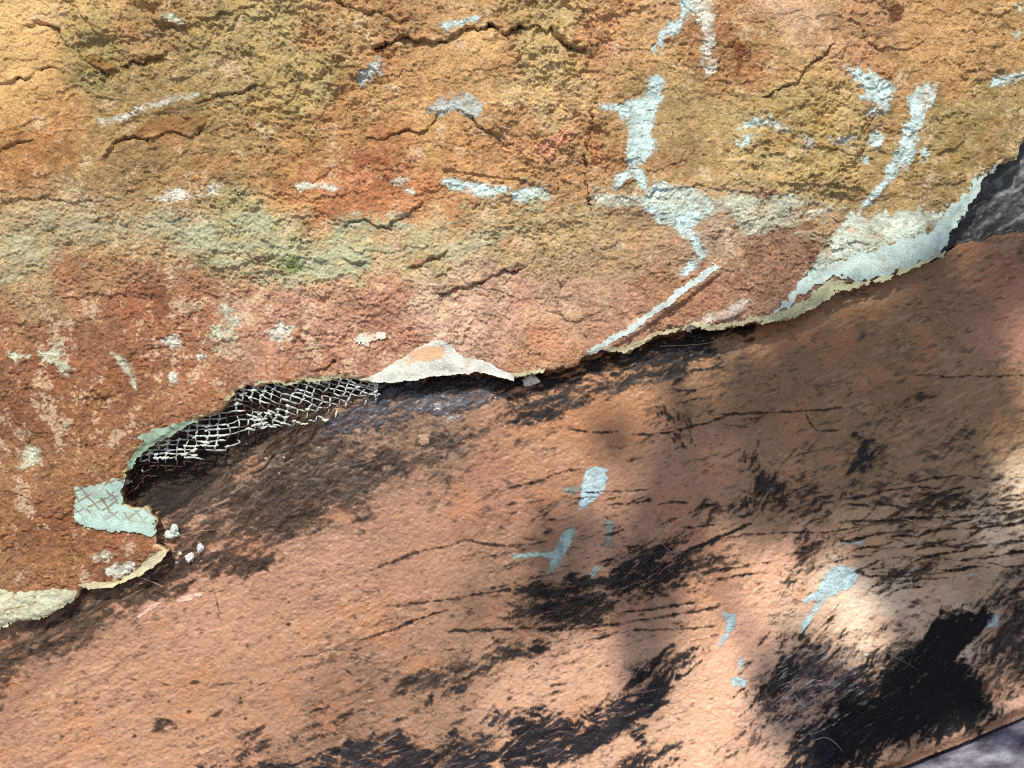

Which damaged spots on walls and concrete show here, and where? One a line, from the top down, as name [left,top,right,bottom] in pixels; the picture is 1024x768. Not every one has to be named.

crack [374,21,610,51]
peeling [587,65,1024,355]
peeling [110,352,137,389]
peeling [254,374,341,386]
peeling [361,340,545,383]
peeling [73,420,198,537]
leakage [0,324,764,710]
peeling [0,550,167,628]
peeling [133,592,204,620]
leakage [768,431,1024,729]
leakage [196,622,718,768]
leakage [715,604,920,768]